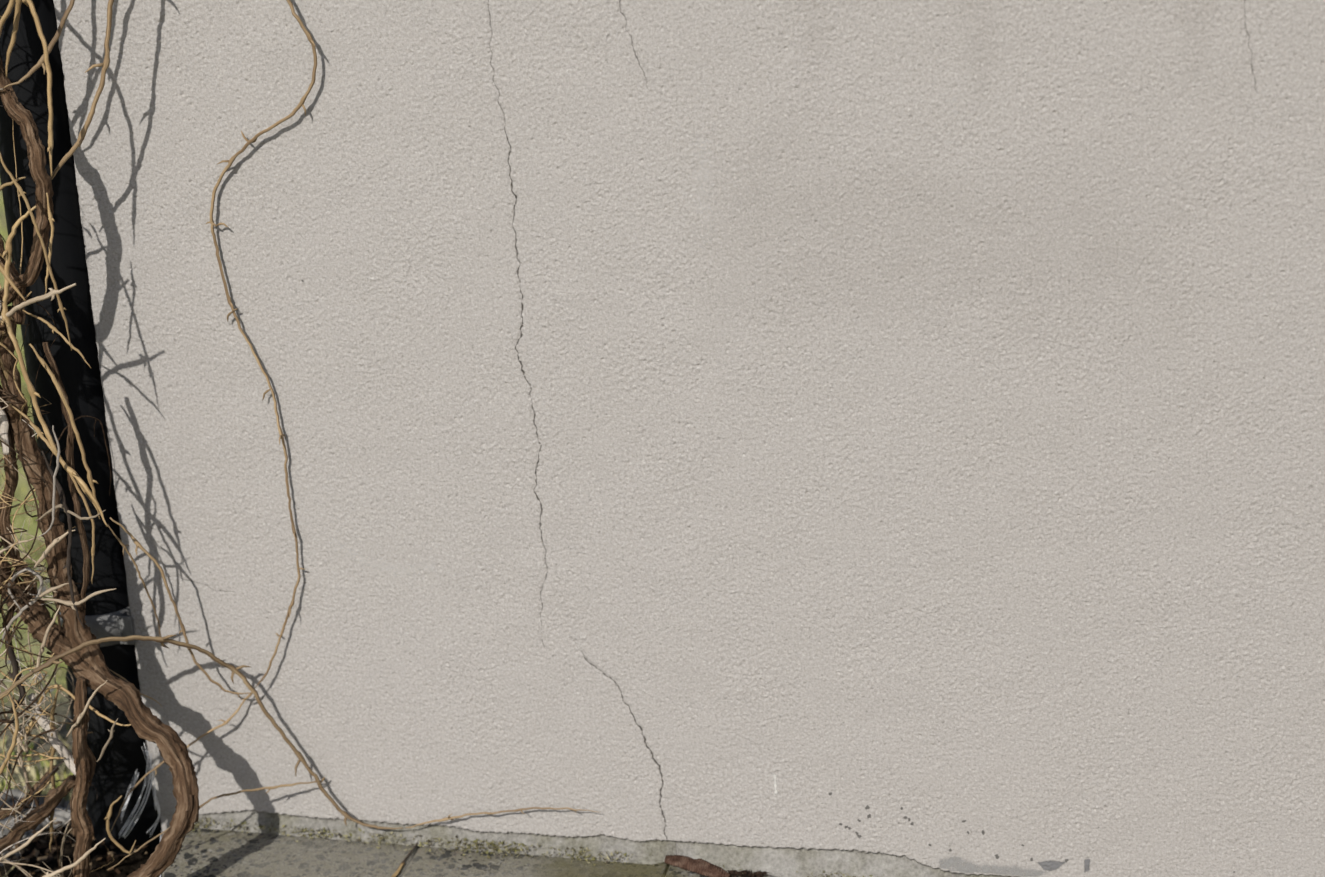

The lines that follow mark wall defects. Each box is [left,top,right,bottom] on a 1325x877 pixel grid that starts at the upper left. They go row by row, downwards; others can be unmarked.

crack [584,657,667,839]